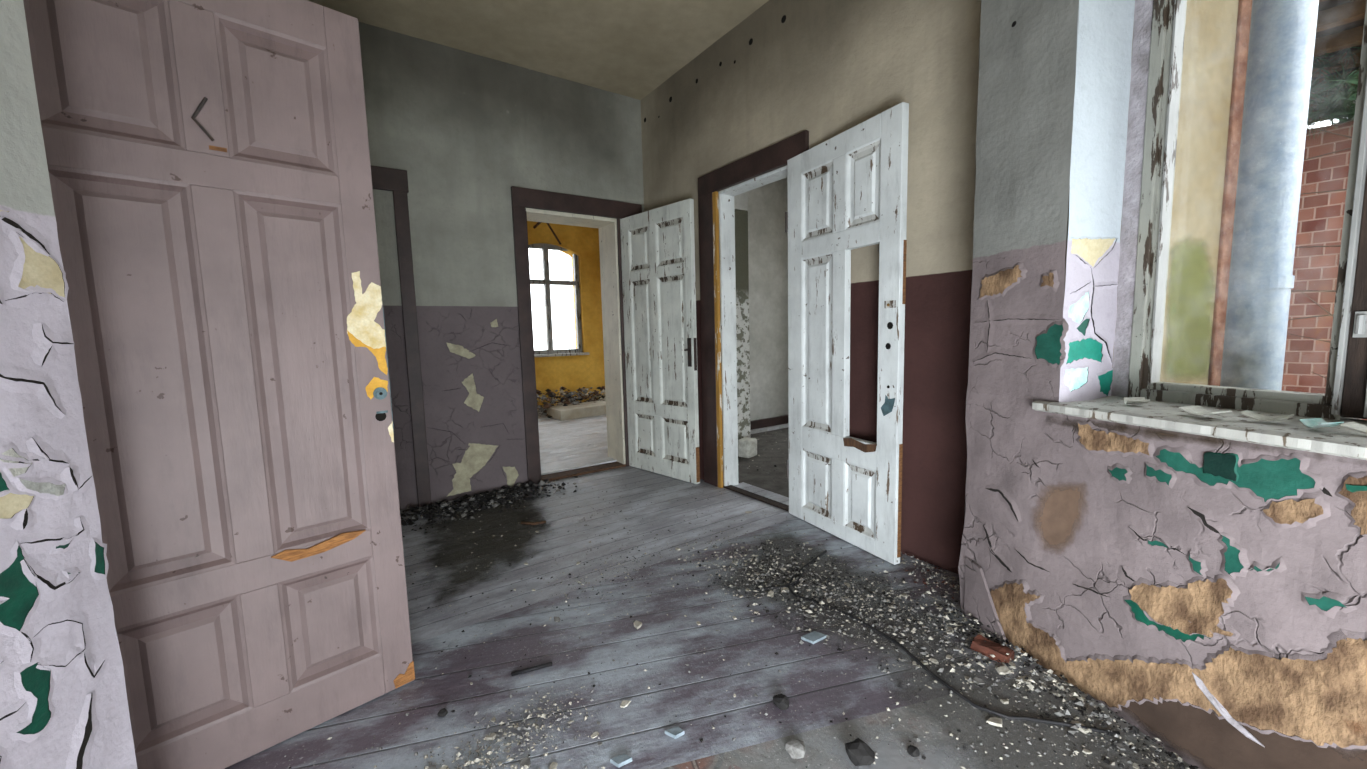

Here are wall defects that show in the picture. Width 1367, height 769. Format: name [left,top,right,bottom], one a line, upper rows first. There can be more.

peeling [1068,236,1119,270]
peeling [347,271,388,399]
peeling [1032,290,1150,404]
peeling [1179,405,1367,434]
peeling [0,541,41,637]
peeling [0,442,68,526]
crack [0,211,136,769]
peeling [49,533,108,584]
crack [982,484,1224,601]
flaking render [964,532,1367,750]
peeling [1076,420,1367,537]
peeling [7,656,55,743]